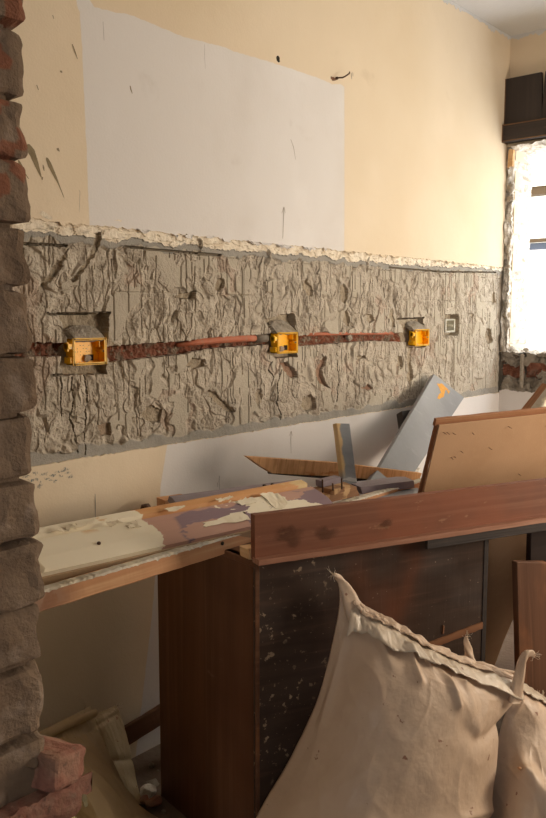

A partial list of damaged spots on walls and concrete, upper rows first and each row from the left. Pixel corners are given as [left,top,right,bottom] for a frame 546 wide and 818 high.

spalling [10,147,546,466]